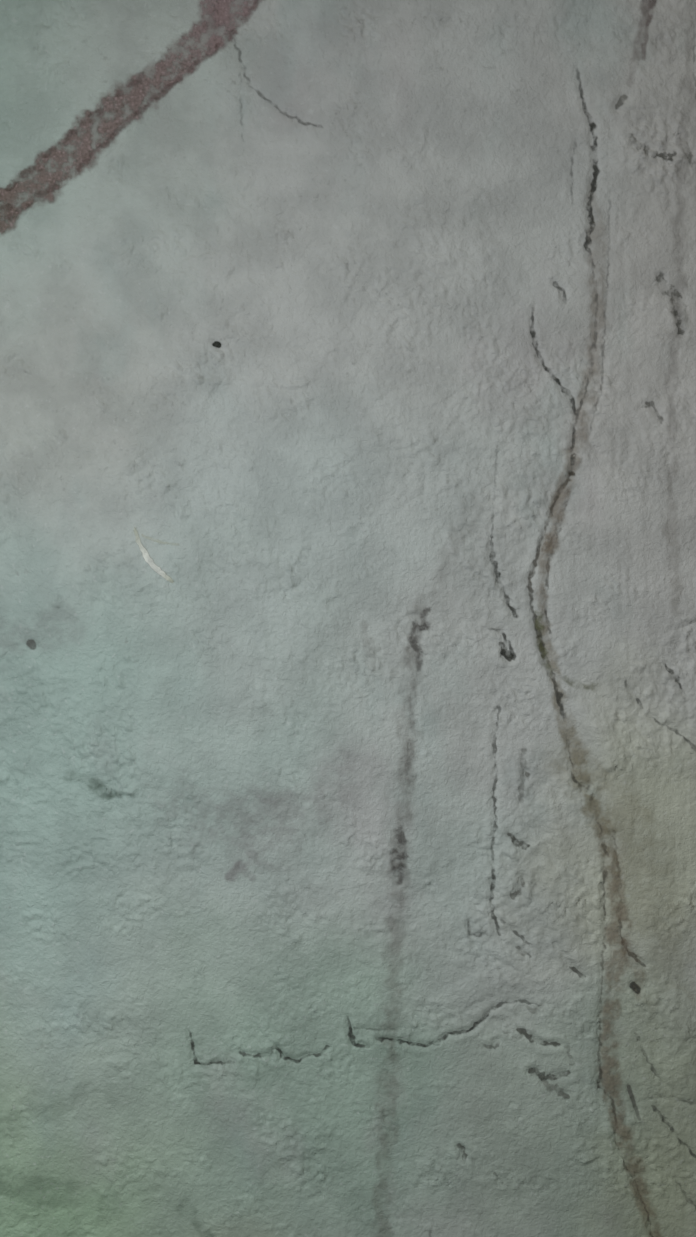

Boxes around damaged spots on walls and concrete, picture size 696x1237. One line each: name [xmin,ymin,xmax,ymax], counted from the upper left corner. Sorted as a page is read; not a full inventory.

crack [580,91,599,249]
crack [530,316,575,411]
crack [552,441,575,507]
crack [490,550,563,711]
crack [490,870,523,937]
crack [191,1042,320,1064]
crack [348,1004,500,1047]